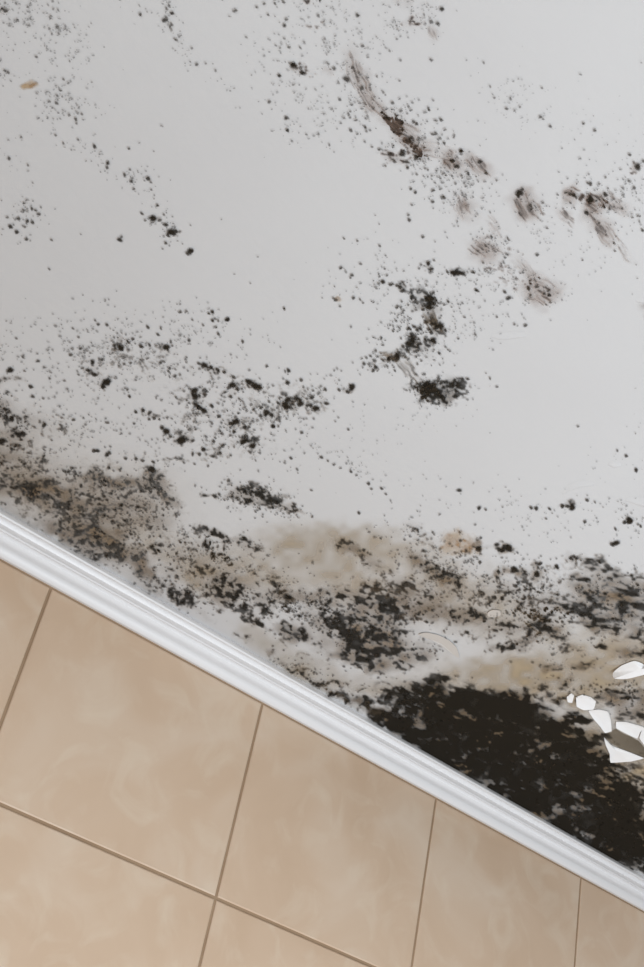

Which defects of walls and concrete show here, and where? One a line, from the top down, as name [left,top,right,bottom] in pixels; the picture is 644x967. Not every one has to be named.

water stain [333,75,497,222]
water stain [123,169,180,249]
water stain [557,154,644,232]
water stain [69,328,111,389]
water stain [94,320,173,365]
water stain [361,268,470,405]
water stain [0,356,644,873]
peeling [613,661,644,679]
peeling [567,693,644,763]